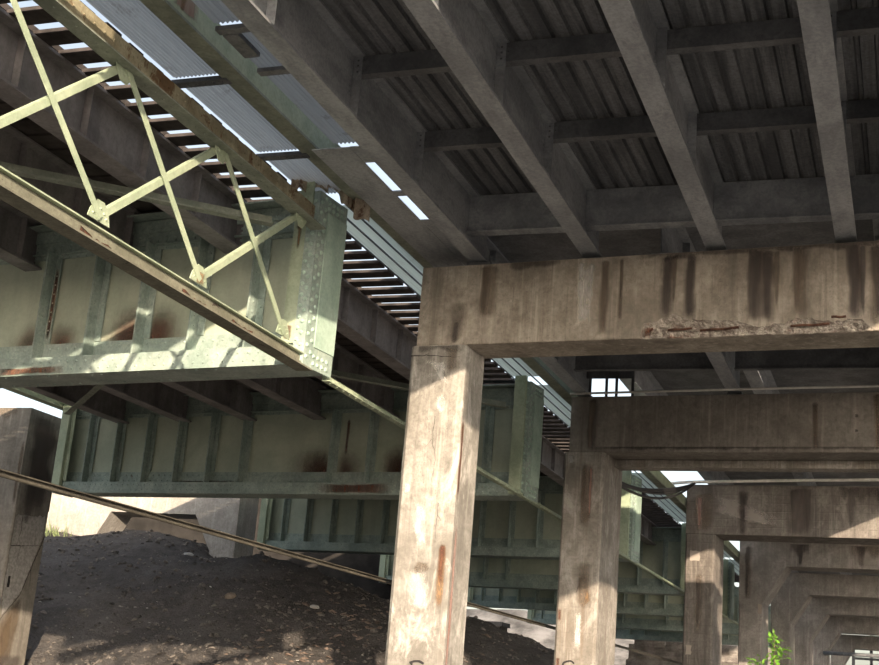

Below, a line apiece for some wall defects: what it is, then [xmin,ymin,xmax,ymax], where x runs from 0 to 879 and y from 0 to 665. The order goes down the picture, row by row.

corrosion [47,273,69,344]
corrosion [112,322,135,341]
corrosion [149,319,173,339]
leakage [481,267,495,314]
leakage [578,262,607,328]
spalling [641,314,871,339]
leakage [659,241,879,319]
corrosion [330,484,381,493]
corrosion [387,458,402,472]
corrosion [581,467,592,521]
leakage [739,492,747,531]
corrosion [436,537,456,665]